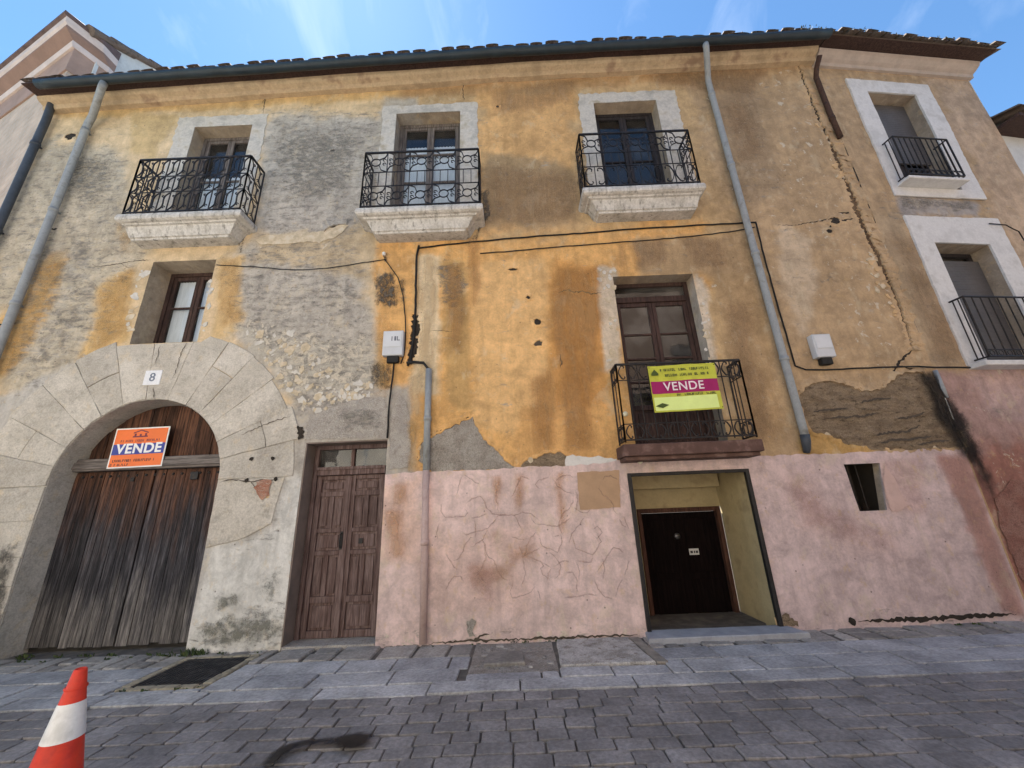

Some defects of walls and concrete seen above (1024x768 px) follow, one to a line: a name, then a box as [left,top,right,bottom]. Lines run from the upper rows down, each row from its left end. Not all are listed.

crack [772,65,925,392]
damp [375,273,404,306]
peeling [246,330,375,414]
damp [372,363,392,388]
spalling [798,367,964,453]
flaking render [254,477,275,502]
spalling [415,413,573,472]
damp [971,440,994,497]
crack [384,633,637,648]
crack [859,612,1016,623]